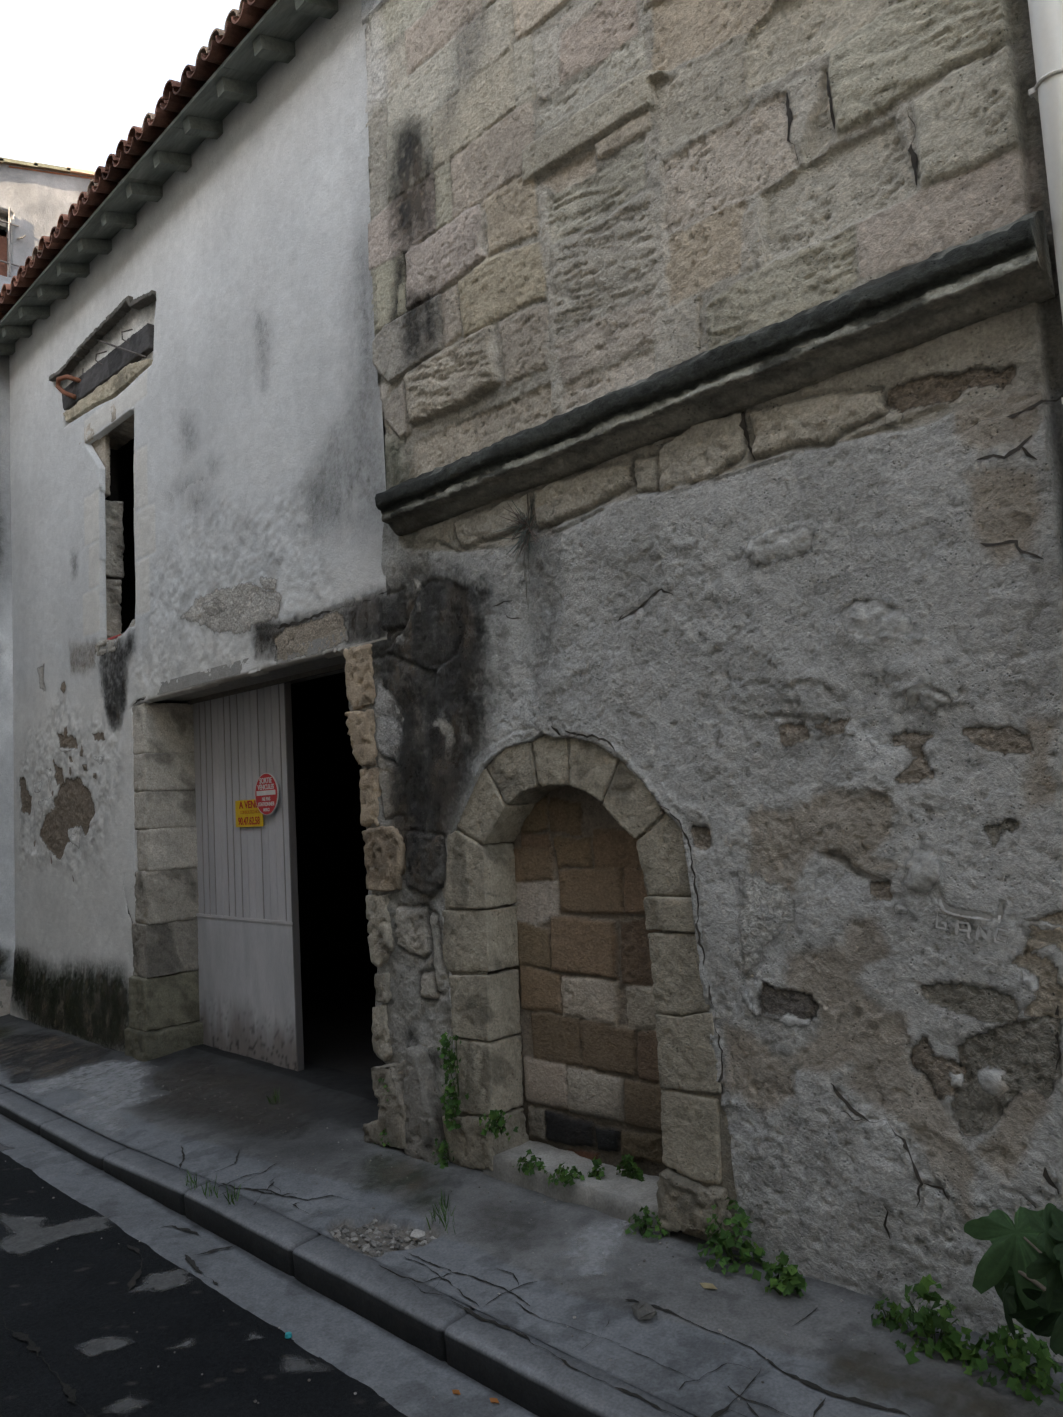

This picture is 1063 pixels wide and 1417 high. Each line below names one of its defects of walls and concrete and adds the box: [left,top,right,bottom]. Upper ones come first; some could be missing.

water stain [391,123,439,358]
peeling [19,726,105,864]
water stain [71,634,134,725]
peeling [180,576,349,664]
water stain [254,618,302,658]
water stain [323,566,486,912]
water stain [0,949,130,1051]
spalling [739,982,830,1027]
spalling [911,911,1063,1137]
crack [831,1083,949,1238]
crack [382,1254,910,1417]